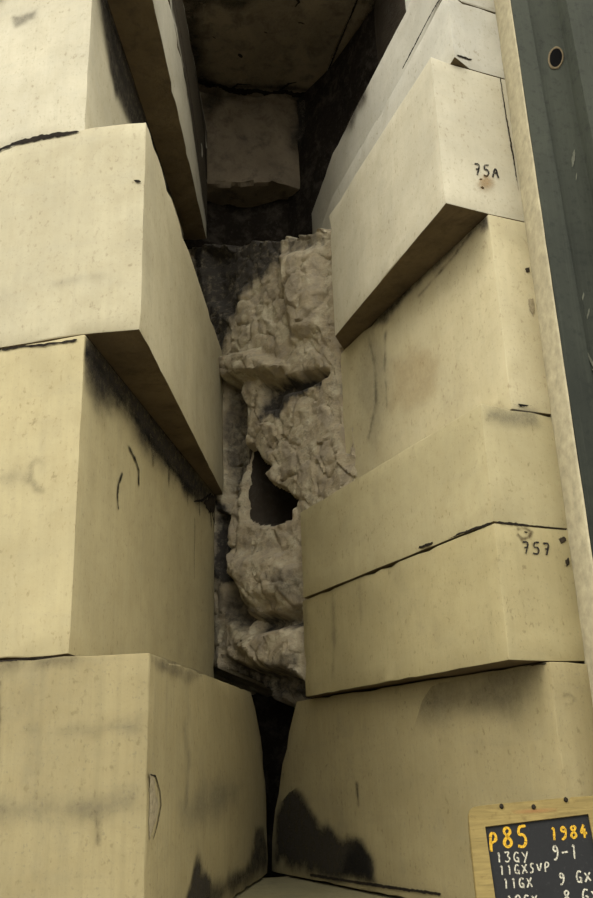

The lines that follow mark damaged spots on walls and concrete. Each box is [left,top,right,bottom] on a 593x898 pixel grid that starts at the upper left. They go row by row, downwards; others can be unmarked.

damp [172,0,220,221]
crack [0,131,79,151]
crack [0,339,77,351]
spalling [188,228,357,708]
crack [0,655,43,663]